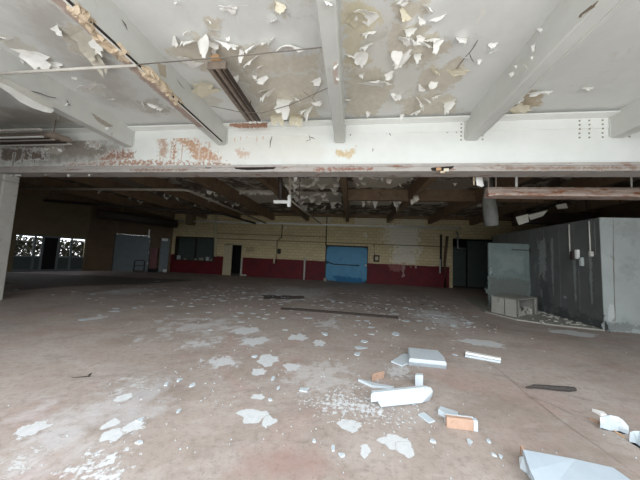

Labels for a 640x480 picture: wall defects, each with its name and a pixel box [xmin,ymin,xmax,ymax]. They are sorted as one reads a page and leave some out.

peeling [0,34,64,70]
peeling [50,1,131,100]
peeling [164,0,482,127]
peeling [0,75,57,113]
spalling [135,63,184,117]
peeling [508,89,553,114]
corrosion [0,146,50,166]
corrosion [62,122,276,173]
corrosion [313,144,376,173]
peeling [283,177,401,223]
peeling [351,177,413,189]